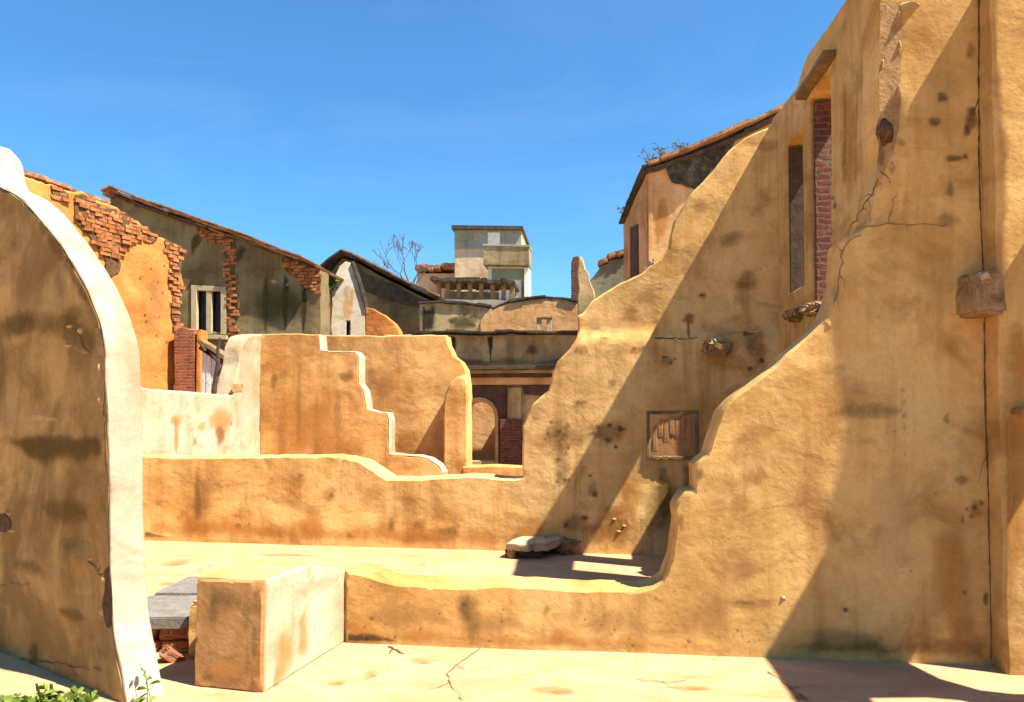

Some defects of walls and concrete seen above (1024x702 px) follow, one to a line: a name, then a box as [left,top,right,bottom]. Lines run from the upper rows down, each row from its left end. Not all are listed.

crack [975,0,984,271]
flaking render [50,185,187,329]
flaking render [196,227,240,345]
flaking render [281,257,323,294]
crack [824,153,946,330]
crack [978,318,992,660]
crack [433,648,480,699]